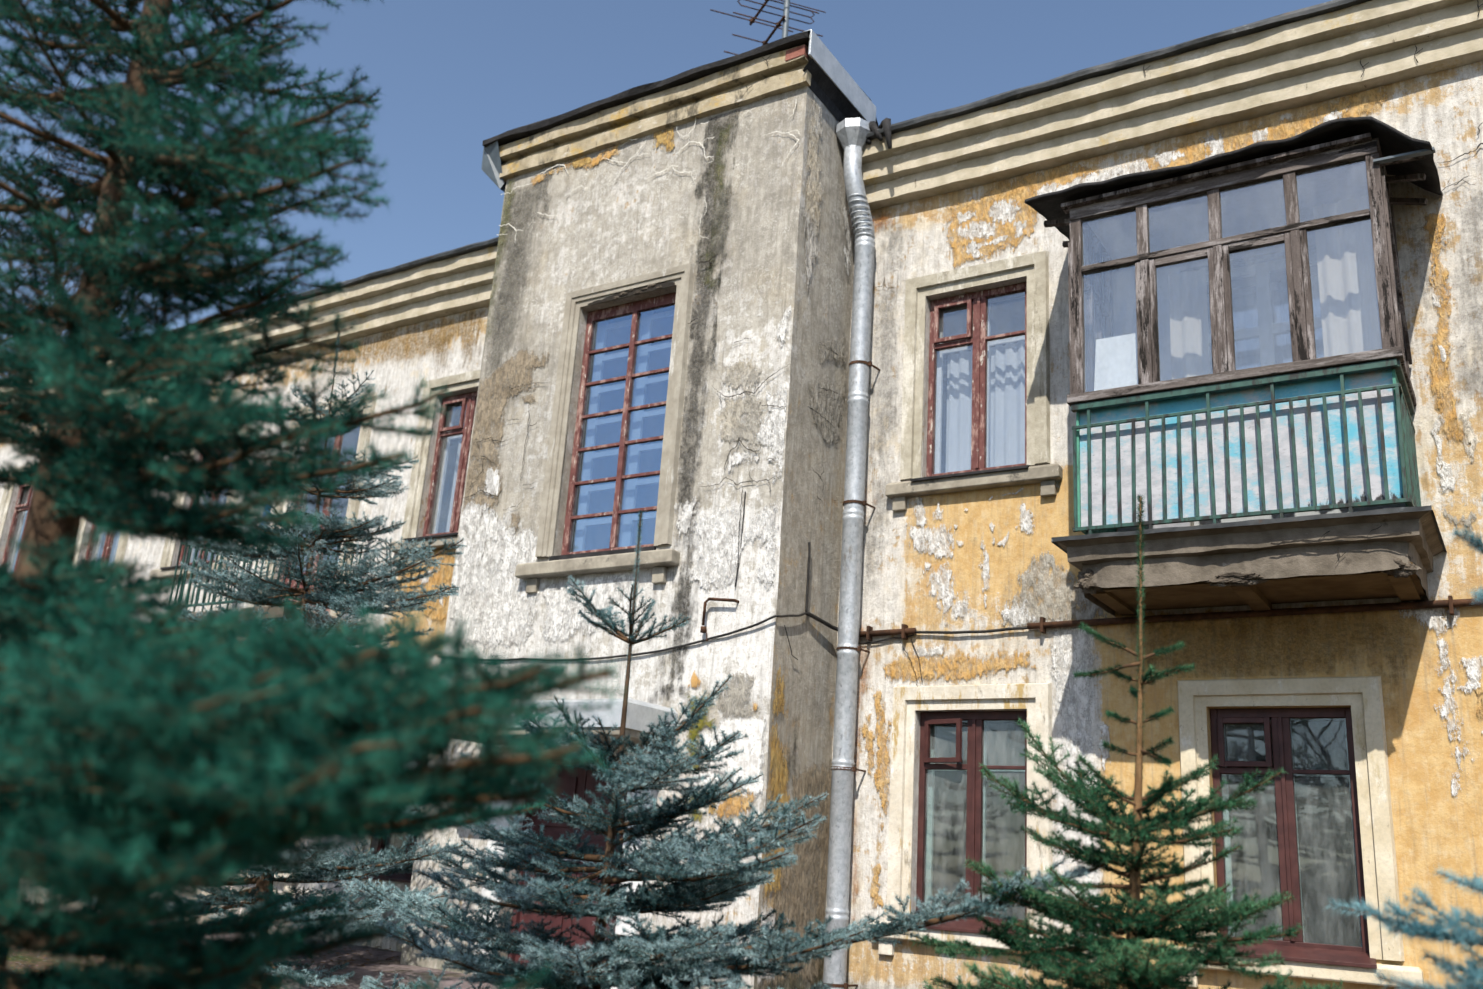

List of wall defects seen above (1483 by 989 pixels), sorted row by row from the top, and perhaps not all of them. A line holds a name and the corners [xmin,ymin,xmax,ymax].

peeling [942,87,1388,268]
crack [1437,122,1483,191]
peeling [777,305,792,346]
damp [650,110,737,701]
flaking render [719,361,787,484]
flaking render [809,333,847,445]
peeling [399,349,638,649]
peeling [674,497,778,592]
peeling [861,488,1111,839]
peeling [1398,599,1483,797]
peeling [870,863,883,908]